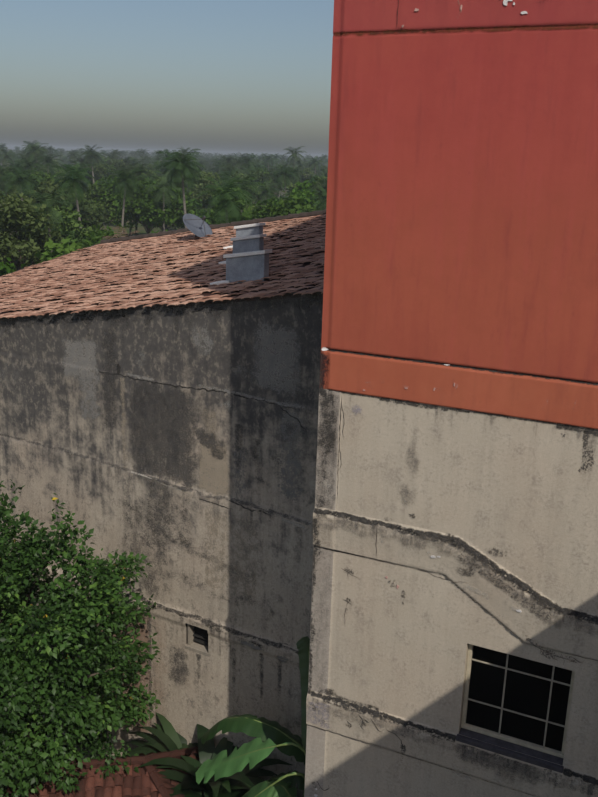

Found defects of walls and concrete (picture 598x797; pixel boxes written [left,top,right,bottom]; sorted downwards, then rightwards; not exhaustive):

crack [62,361,311,432]
water stain [0,292,598,795]
crack [321,534,598,665]
crack [343,714,533,796]